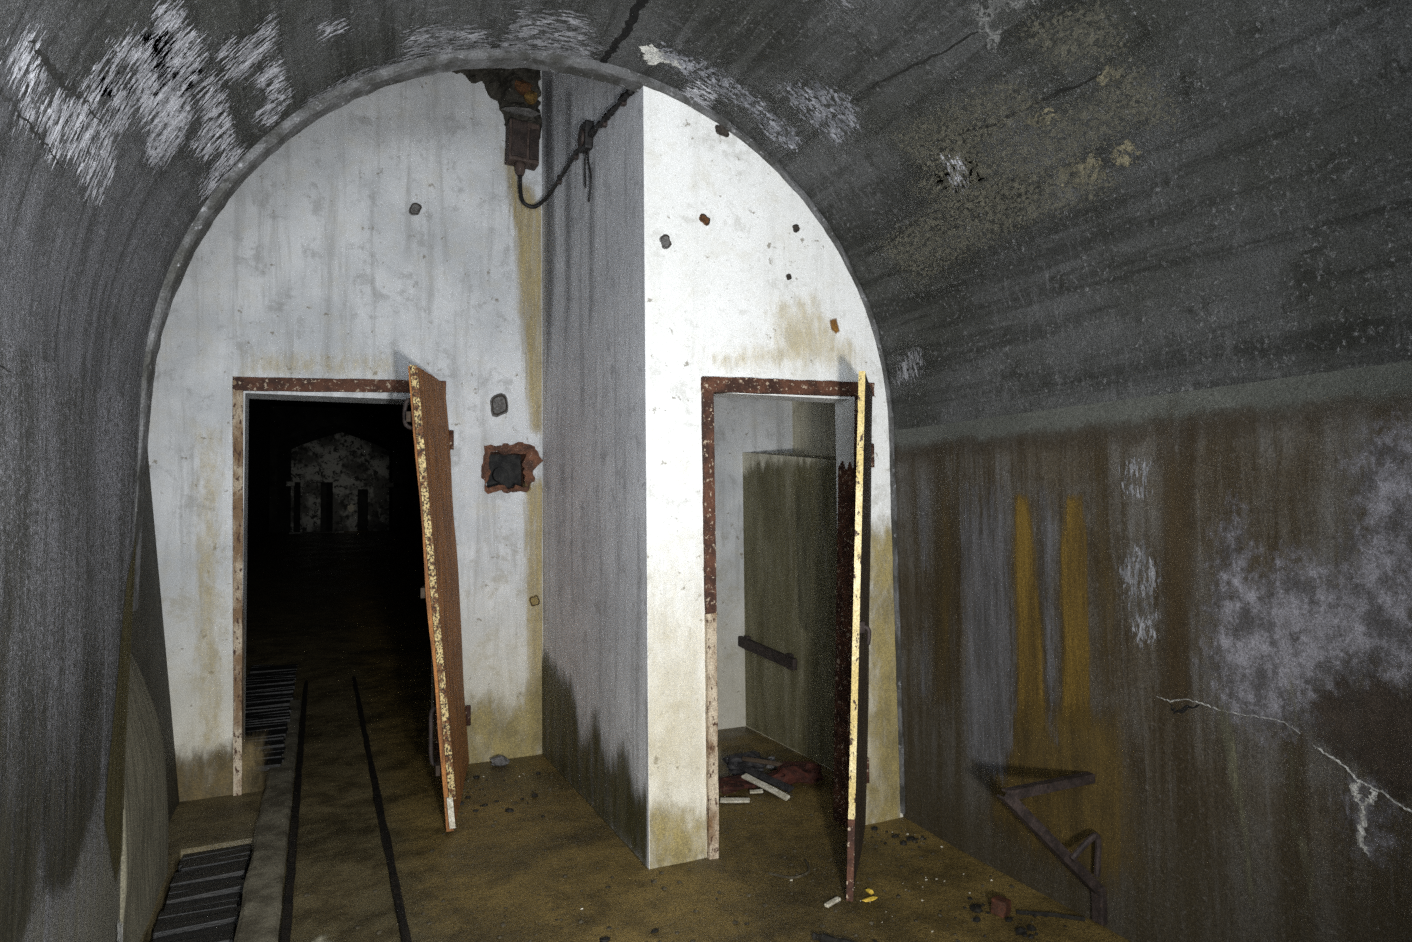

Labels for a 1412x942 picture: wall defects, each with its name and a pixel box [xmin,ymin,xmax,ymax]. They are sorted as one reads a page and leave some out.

damp [639,44,682,69]
damp [0,539,136,942]
crack [1157,696,1412,857]
damp [1205,429,1412,888]